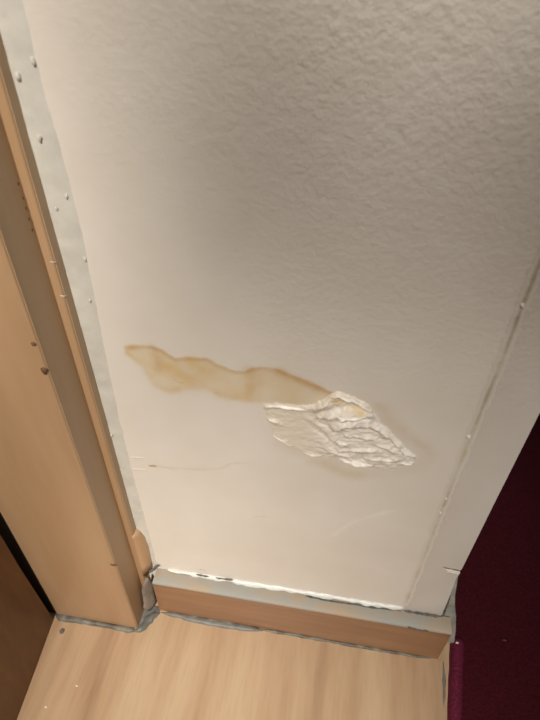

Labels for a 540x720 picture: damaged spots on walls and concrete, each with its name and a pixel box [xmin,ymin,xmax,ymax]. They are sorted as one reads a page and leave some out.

water stain [121,340,448,486]